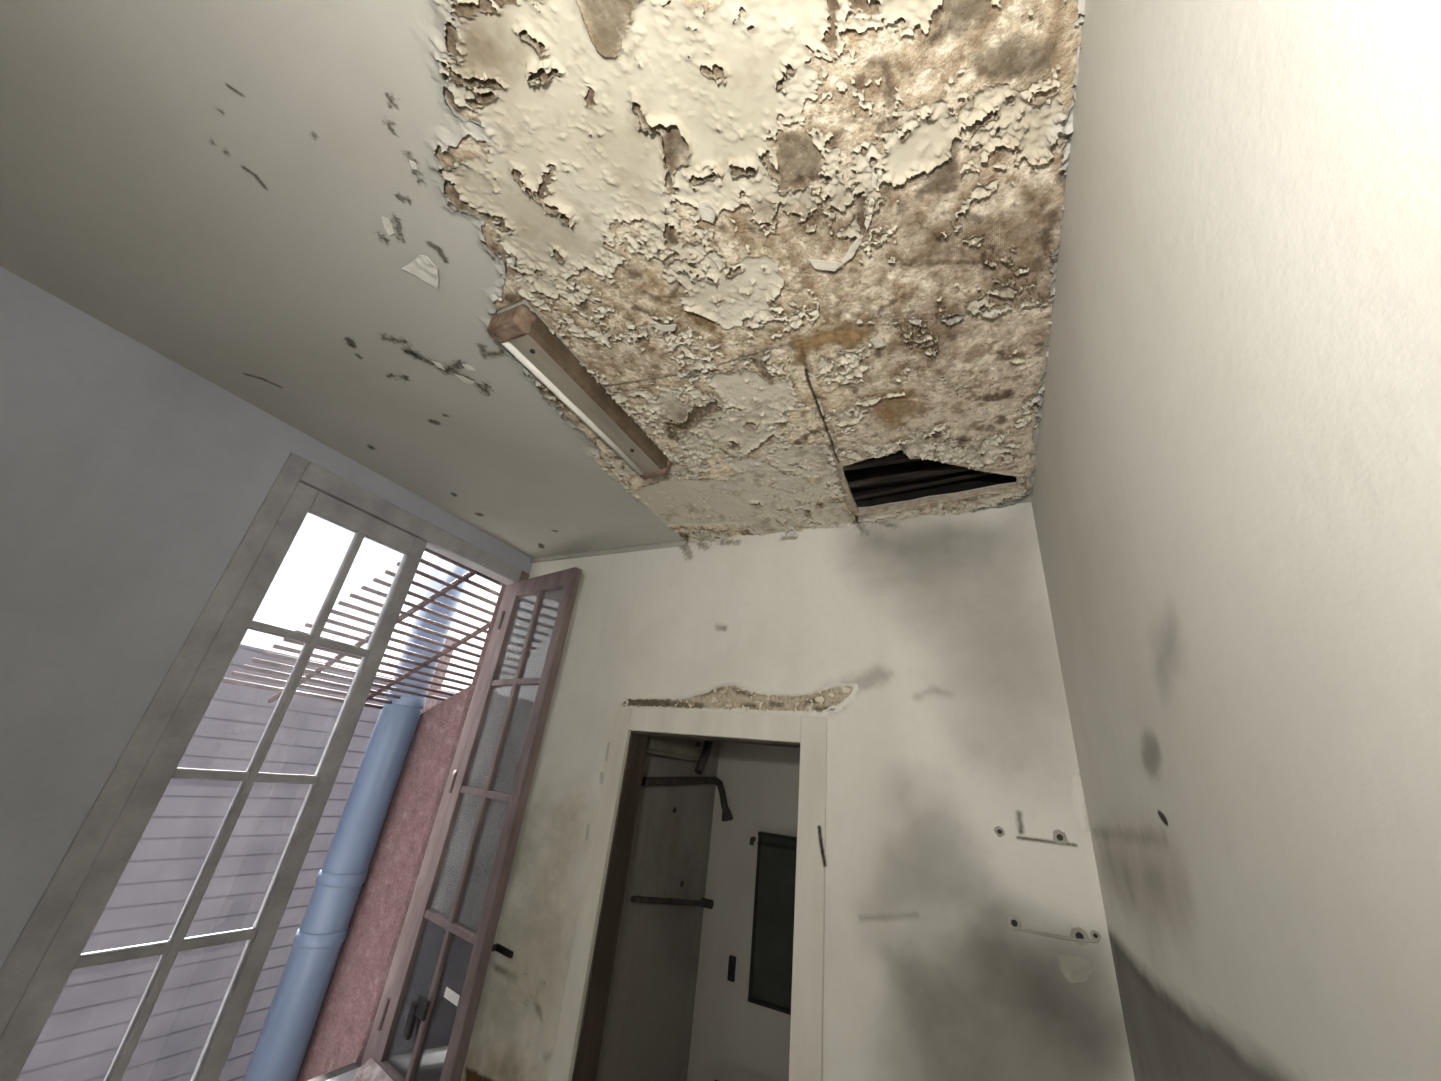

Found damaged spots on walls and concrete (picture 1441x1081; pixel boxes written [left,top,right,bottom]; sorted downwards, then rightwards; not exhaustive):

peeling [379,0,1086,544]
flaking render [619,680,860,717]